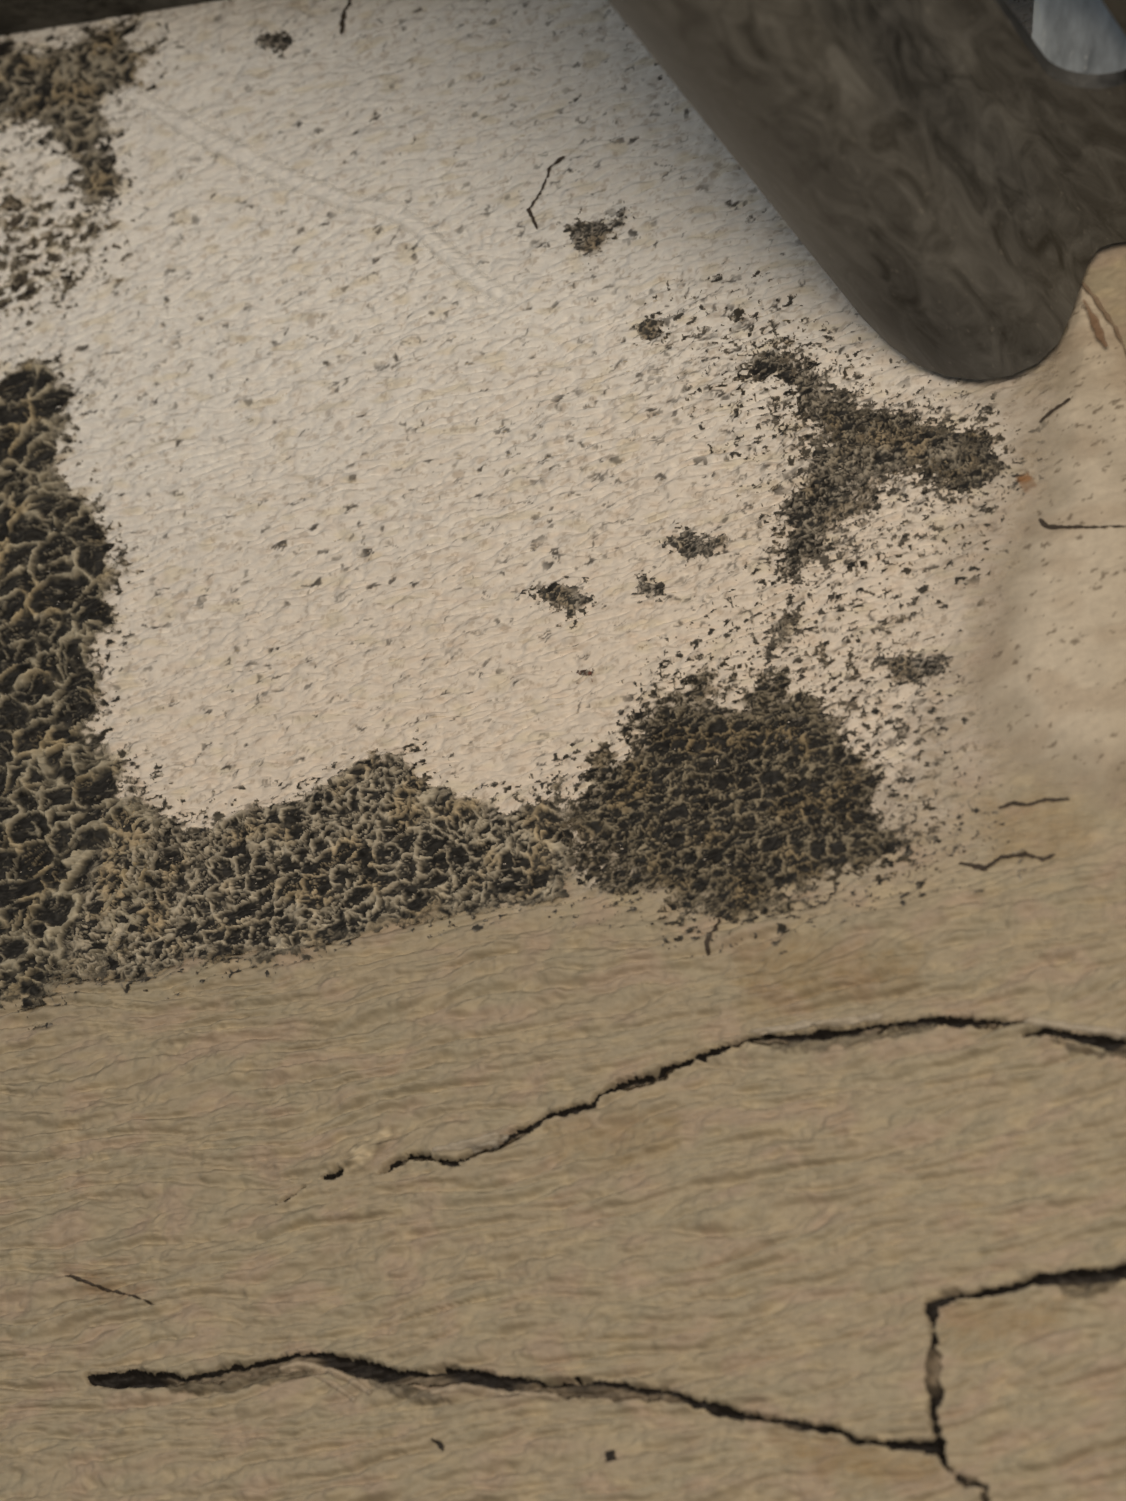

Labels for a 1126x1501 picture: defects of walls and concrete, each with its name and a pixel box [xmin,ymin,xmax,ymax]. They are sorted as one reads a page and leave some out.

leakage [0,13,1047,1030]
crack [275,1167,344,1205]
crack [388,1013,1126,1172]
crack [87,1264,1126,1501]